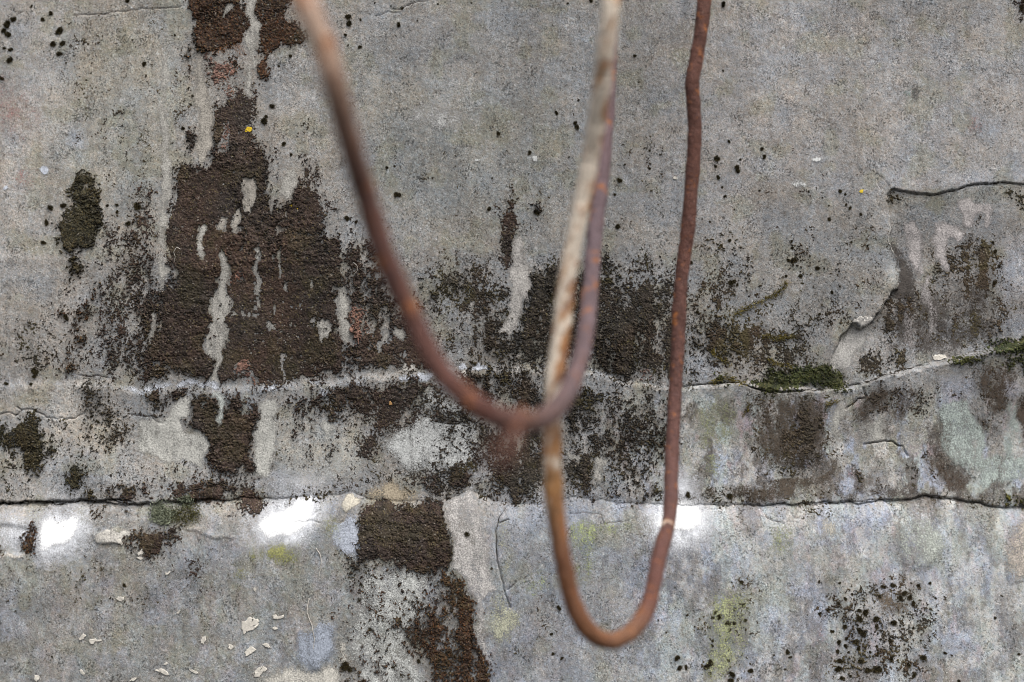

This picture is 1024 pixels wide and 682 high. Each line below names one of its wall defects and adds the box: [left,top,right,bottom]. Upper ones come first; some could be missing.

damp [245,0,262,97]
damp [192,57,214,173]
damp [157,59,173,290]
damp [197,177,257,258]
damp [271,169,298,206]
damp [121,242,261,467]
damp [316,285,352,343]
damp [500,236,533,338]
damp [694,198,1024,507]
damp [383,372,479,473]
crack [0,498,147,506]
damp [446,488,515,655]